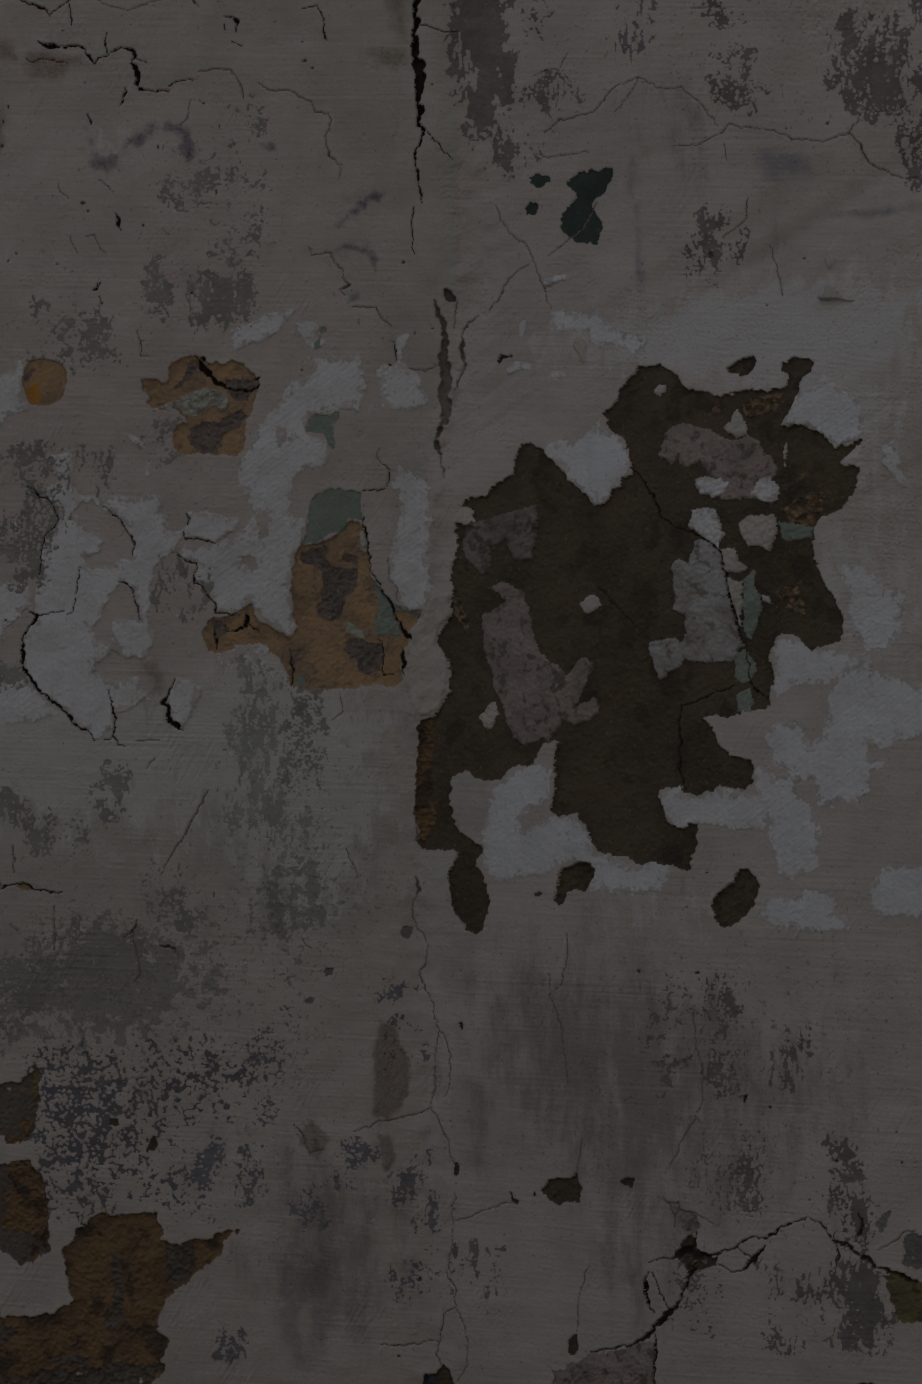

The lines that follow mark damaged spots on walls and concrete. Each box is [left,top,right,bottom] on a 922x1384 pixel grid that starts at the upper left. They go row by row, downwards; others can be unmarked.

crack [21,0,342,179]
crack [410,0,458,255]
crack [26,487,59,575]
crack [20,567,184,769]
crack [102,506,140,620]
spalling [0,94,922,935]
spalling [0,1031,274,1384]
crack [576,1005,919,1384]